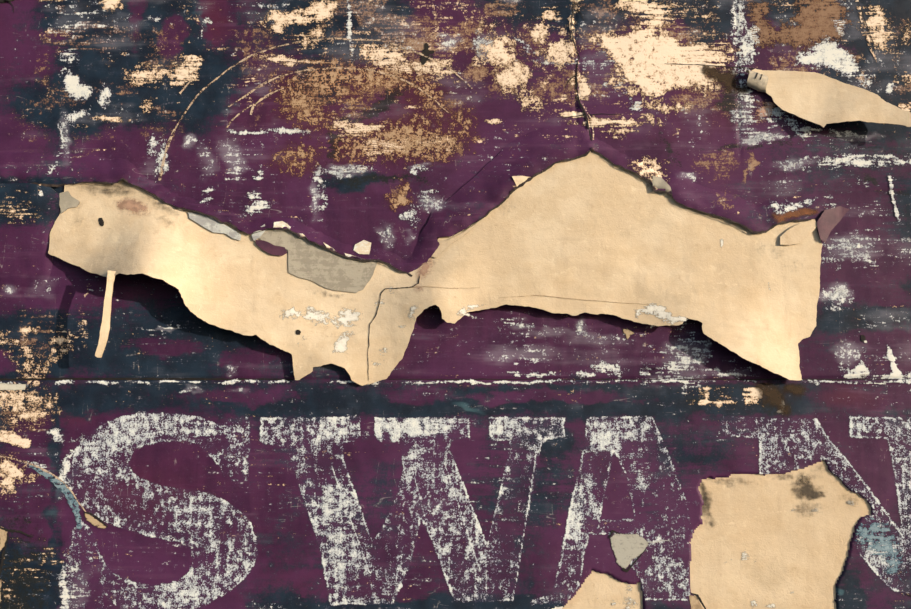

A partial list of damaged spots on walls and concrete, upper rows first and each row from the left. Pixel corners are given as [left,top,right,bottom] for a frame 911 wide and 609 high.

crack [562,0,623,152]
peeling [746,69,911,128]
peeling [856,5,911,52]
peeling [0,0,849,386]
flaking render [552,570,643,609]
flaking render [689,460,871,609]